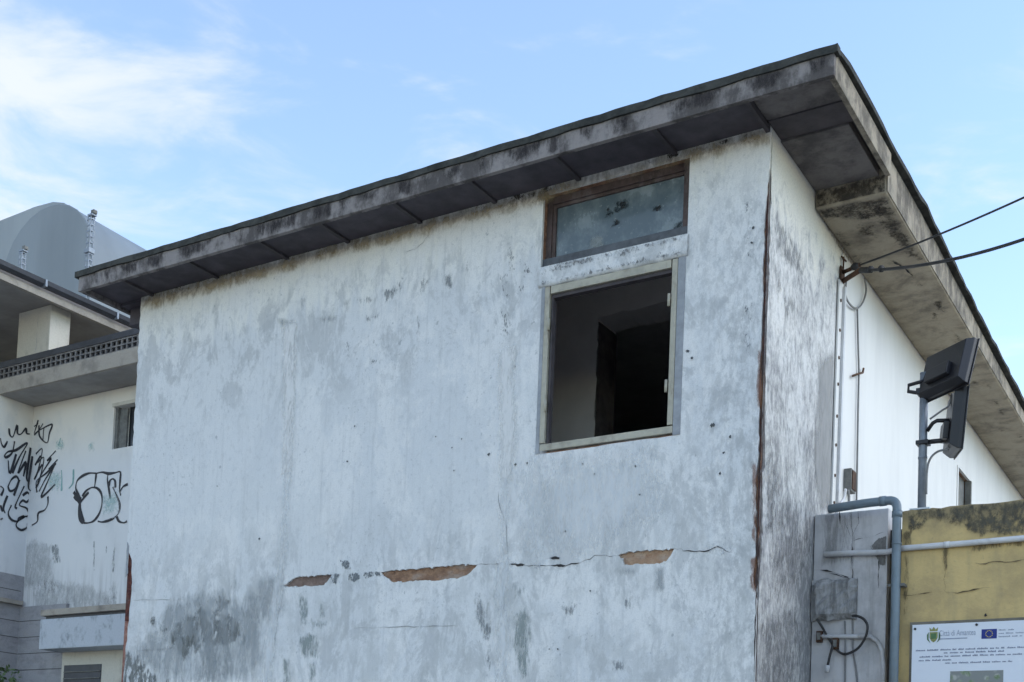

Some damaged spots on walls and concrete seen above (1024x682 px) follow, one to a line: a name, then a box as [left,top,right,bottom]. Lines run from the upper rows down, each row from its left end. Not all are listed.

damp [817,175,920,260]
crack [485,494,616,567]
damp [904,501,1024,550]
spalling [285,560,477,587]
spalling [620,549,674,565]
damp [123,582,282,682]
damp [300,635,316,655]